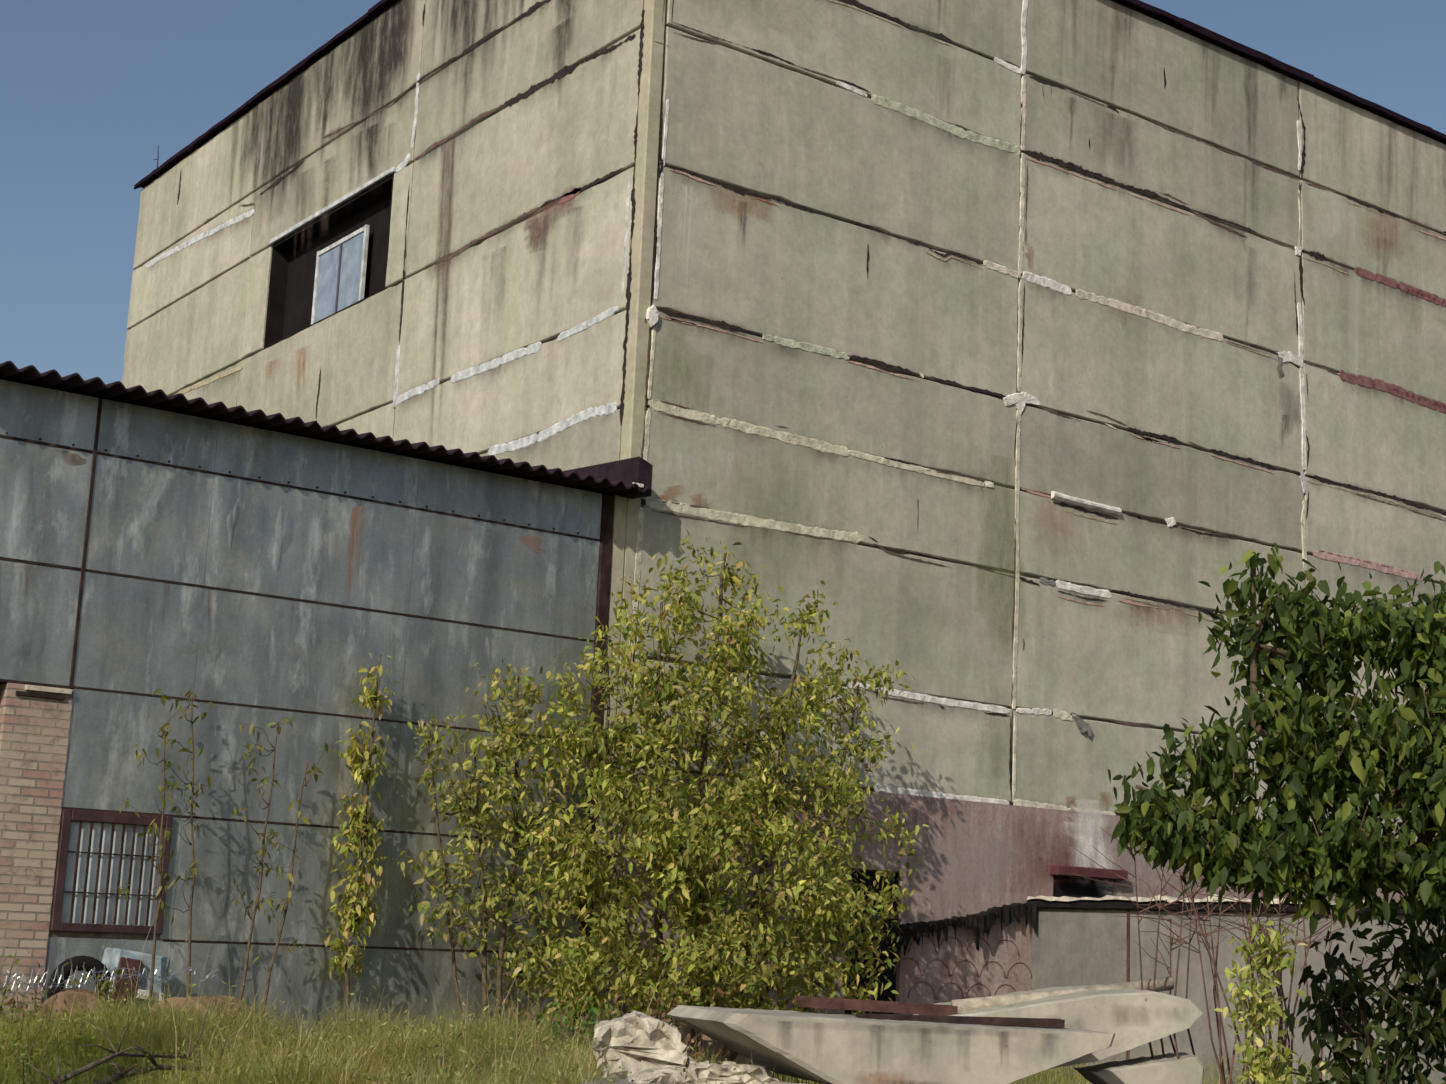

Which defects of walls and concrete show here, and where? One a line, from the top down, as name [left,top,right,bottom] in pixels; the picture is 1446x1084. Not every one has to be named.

leakage [249,0,410,190]
crack [240,0,551,207]
leakage [442,0,489,53]
leakage [435,138,454,341]
crack [399,0,995,458]
crack [1019,283,1027,362]
crack [1020,76,1446,359]
crack [648,499,746,527]
crack [847,355,1446,796]